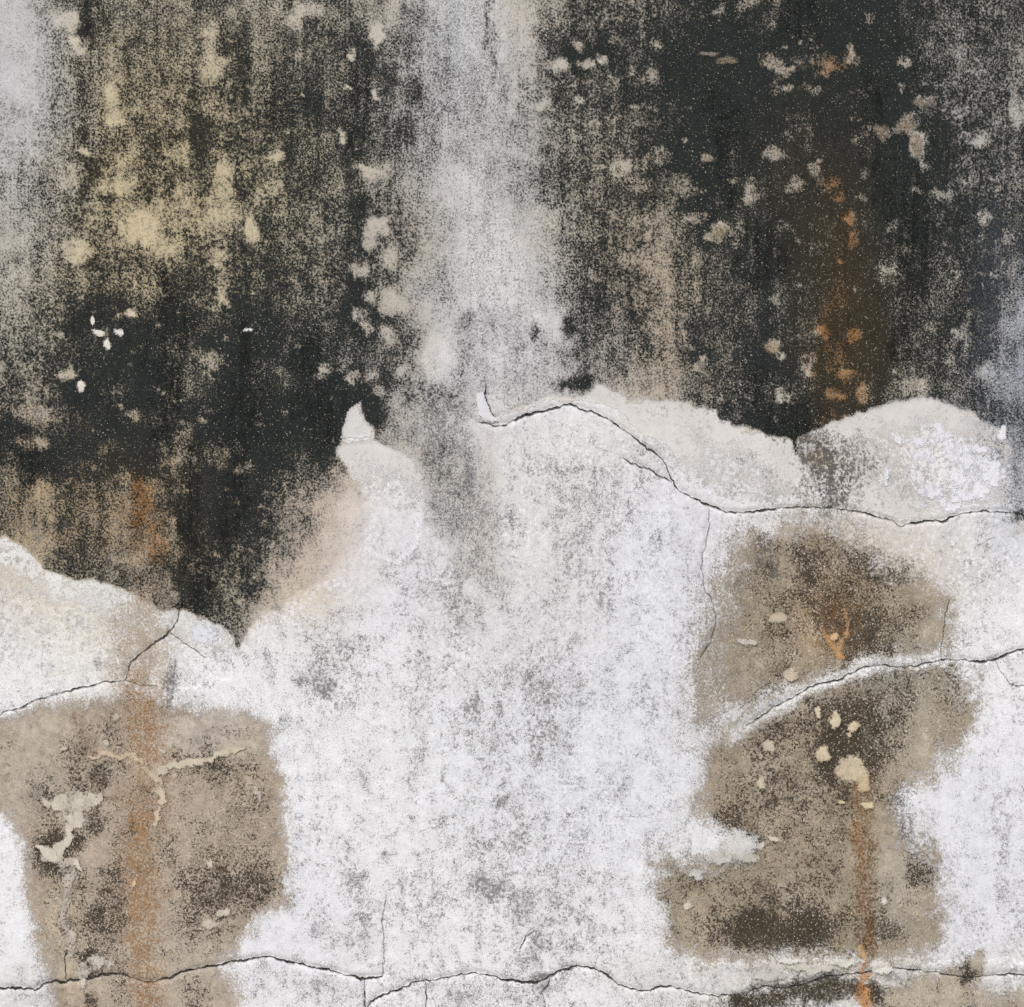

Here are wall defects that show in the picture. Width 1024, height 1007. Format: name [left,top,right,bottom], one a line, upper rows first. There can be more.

rust [816,55,851,79]
damp [0,0,1024,738]
rust [806,174,868,427]
crack [478,382,1024,659]
crack [1,601,205,713]
rust [822,608,849,659]
crack [748,601,1024,724]
damp [35,789,117,988]
rust [128,673,158,1007]
damp [87,745,246,827]
crack [0,895,1024,1007]
rust [849,776,877,1007]